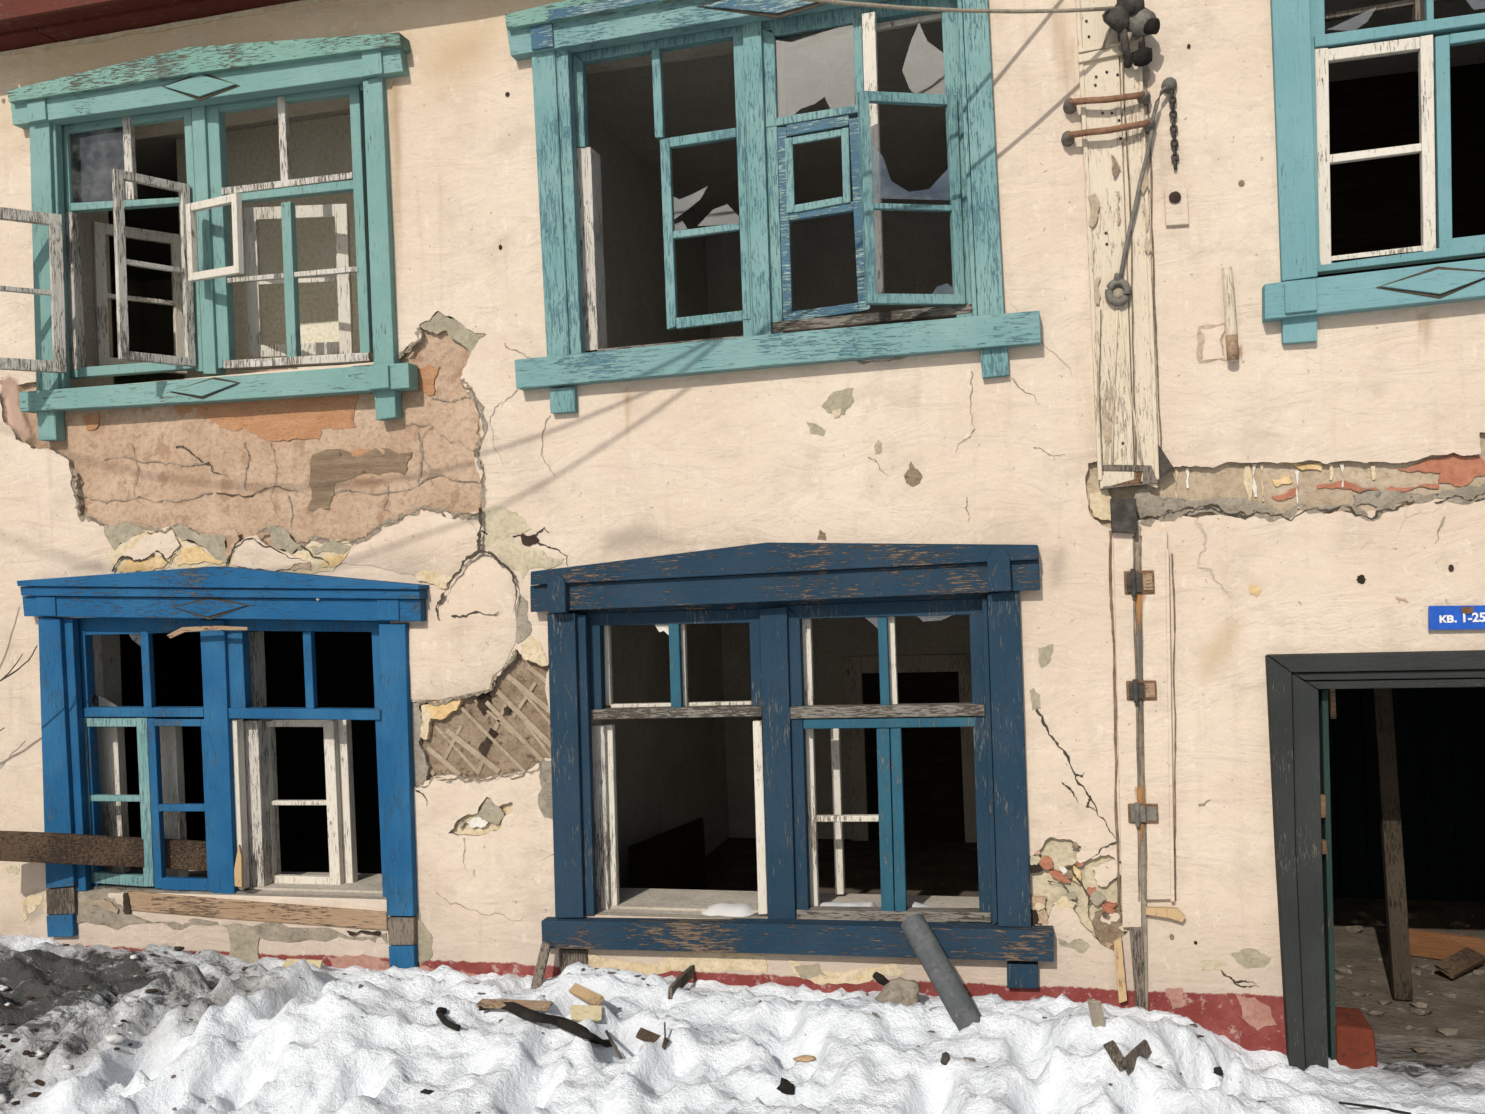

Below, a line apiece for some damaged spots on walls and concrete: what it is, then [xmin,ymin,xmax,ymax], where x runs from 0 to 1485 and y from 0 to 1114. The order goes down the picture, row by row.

flaking render [1196,322,1227,363]
flaking render [807,388,854,436]
flaking render [1085,433,1485,528]
flaking render [3,312,564,835]
crack [435,507,568,620]
crack [1036,709,1116,855]
flaking render [1029,837,1129,953]